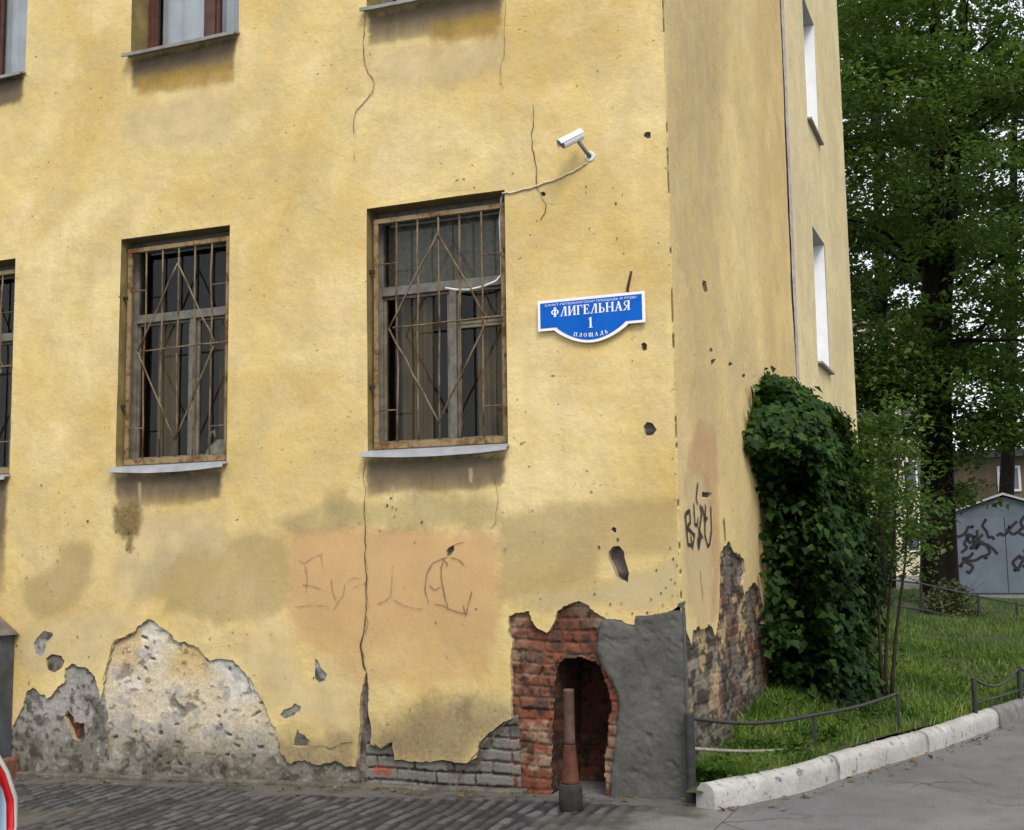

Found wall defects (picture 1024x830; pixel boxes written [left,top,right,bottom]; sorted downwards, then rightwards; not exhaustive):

crack [353,15,374,131]
crack [531,108,546,220]
spalling [644,422,657,436]
leakage [114,471,222,595]
flaking render [11,593,622,797]
crack [306,466,392,768]
spalling [598,527,629,583]
flaking render [686,541,796,765]